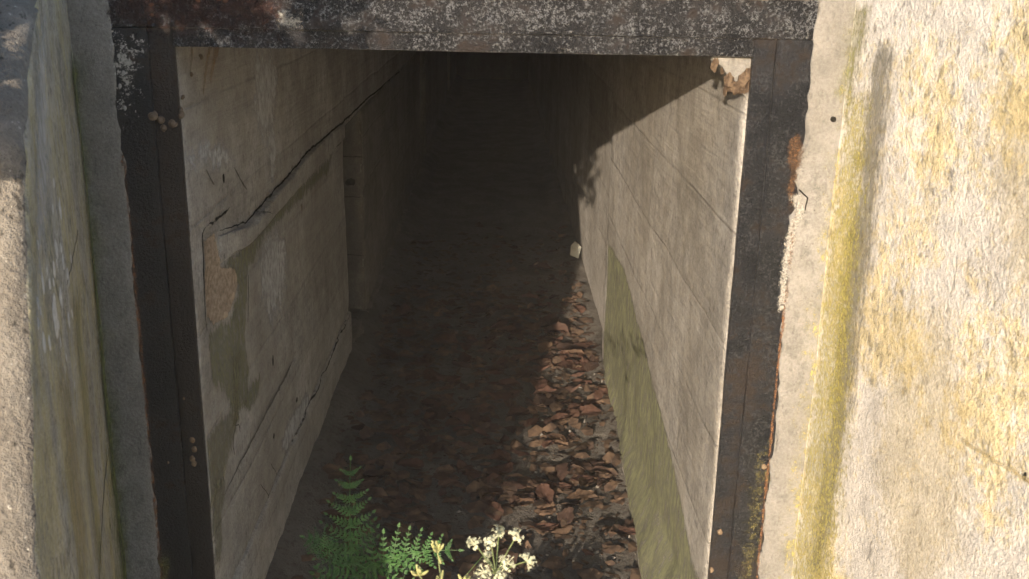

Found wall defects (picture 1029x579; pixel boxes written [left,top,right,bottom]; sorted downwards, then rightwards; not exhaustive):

spalling [708,56,751,101]
crack [202,69,402,327]
peeling [778,195,805,313]
corrosion [788,135,804,205]
corrosion [756,287,788,579]